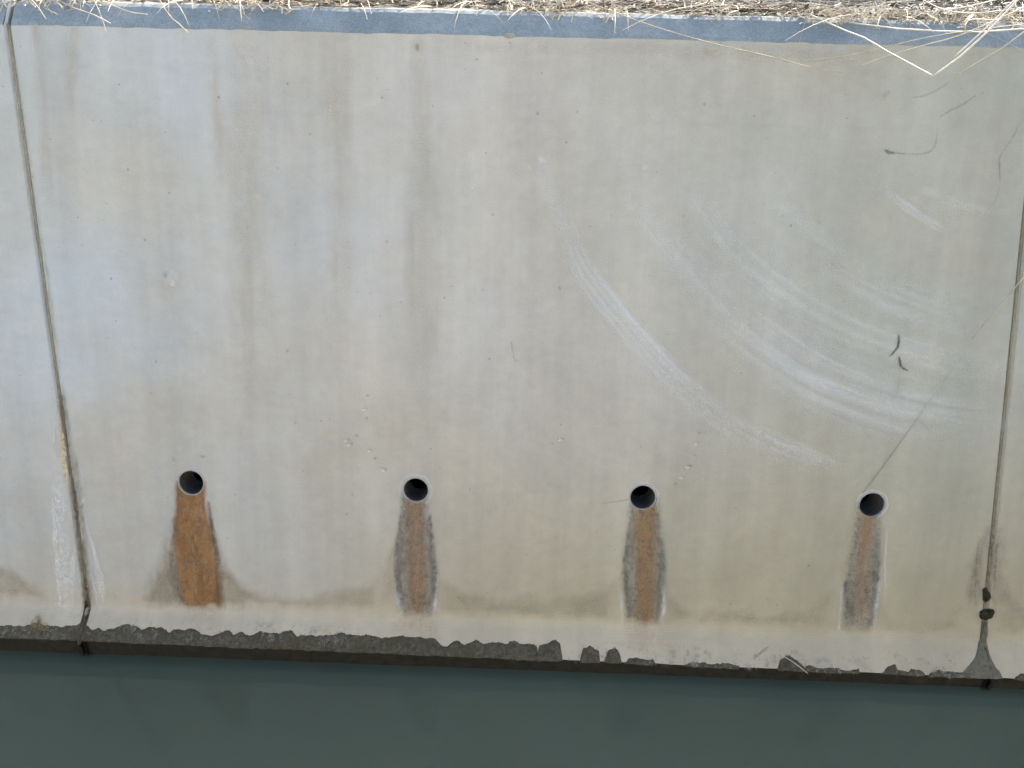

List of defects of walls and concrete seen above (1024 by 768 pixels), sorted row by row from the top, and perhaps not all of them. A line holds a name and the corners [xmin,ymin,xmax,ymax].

water stain [59,395,70,461]
water stain [71,479,98,619]
corrosion [152,483,223,606]
corrosion [395,499,436,624]
corrosion [624,505,664,622]
spalling [0,622,562,662]
spalling [580,646,656,665]
spalling [778,655,860,674]
spalling [882,664,971,679]